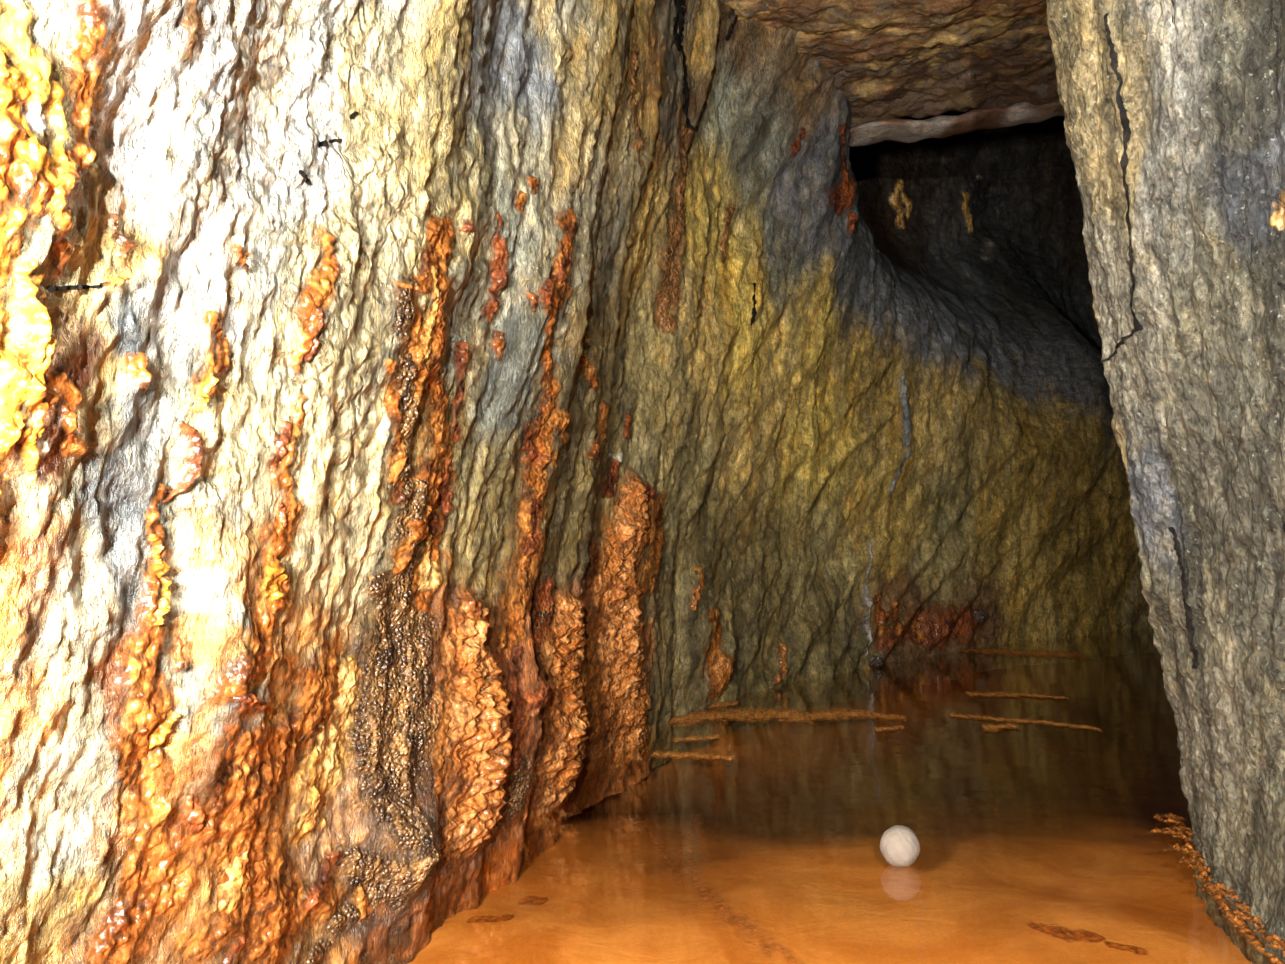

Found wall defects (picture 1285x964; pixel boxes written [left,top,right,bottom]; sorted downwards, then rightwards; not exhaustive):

corrosion [0,0,108,484]
corrosion [121,353,153,392]
corrosion [192,305,230,410]
corrosion [232,244,250,271]
corrosion [291,226,341,375]
corrosion [393,205,475,615]
corrosion [482,213,509,361]
corrosion [515,175,540,214]
corrosion [497,208,577,710]
crack [1100,13,1143,365]
crack [1168,527,1198,669]
corrosion [86,394,363,964]